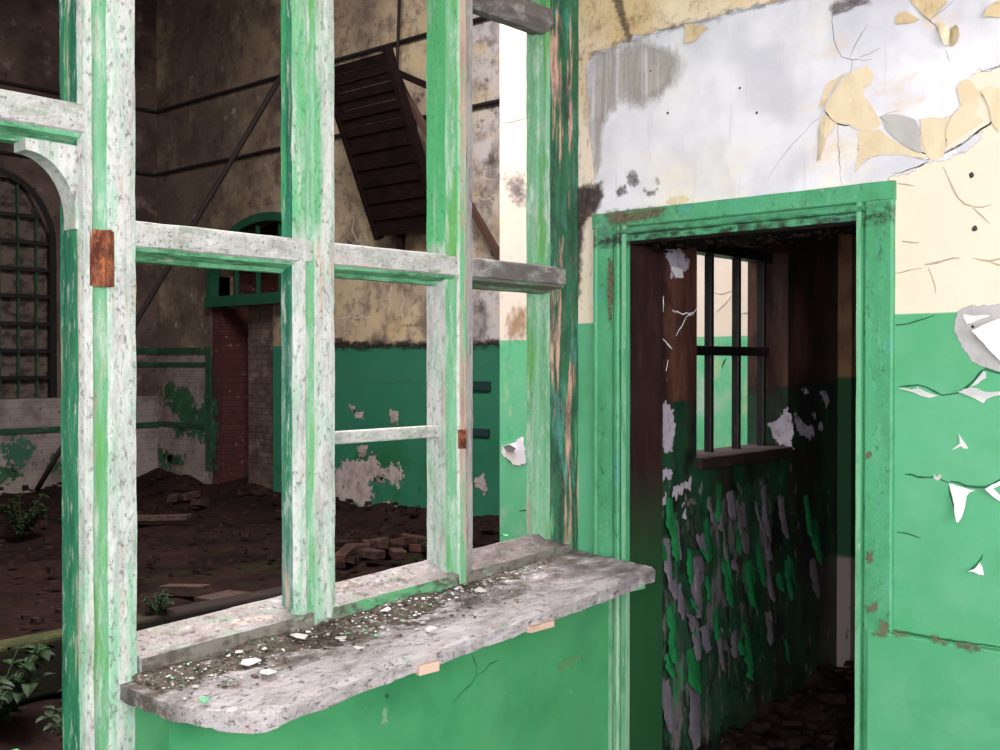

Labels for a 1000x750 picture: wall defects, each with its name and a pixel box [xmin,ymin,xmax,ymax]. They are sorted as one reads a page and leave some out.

crack [831,0,879,73]
water stain [577,0,675,295]
peeling [586,0,1000,214]
crack [768,65,1000,224]
peeling [665,248,690,279]
crack [895,241,1000,326]
spalling [899,304,1000,403]
peeling [663,400,676,454]
peeling [767,407,823,449]
peeling [334,444,405,507]
peeling [905,473,1000,523]
peeling [662,467,823,750]